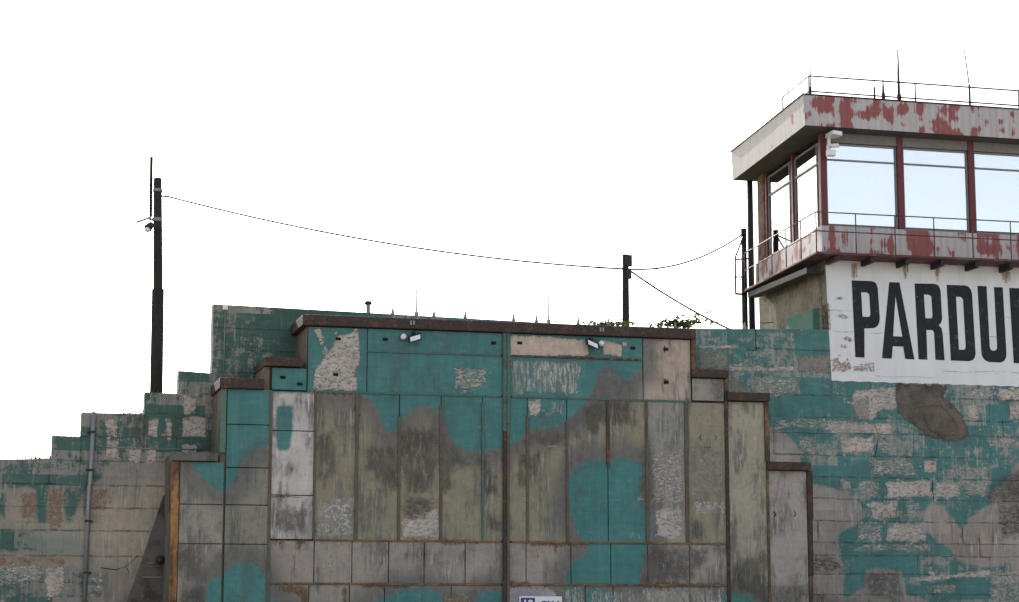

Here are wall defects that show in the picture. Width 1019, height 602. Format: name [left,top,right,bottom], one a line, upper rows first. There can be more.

peeling [310,327,360,393]
peeling [511,335,589,416]
peeling [603,340,627,357]
peeling [699,338,875,396]
peeling [101,419,156,465]
peeling [148,392,207,452]
peeling [775,384,989,552]
leakage [896,383,969,442]
peeling [965,387,1019,423]
peeling [0,557,68,600]
peeling [510,587,724,602]
peeling [907,570,1019,602]